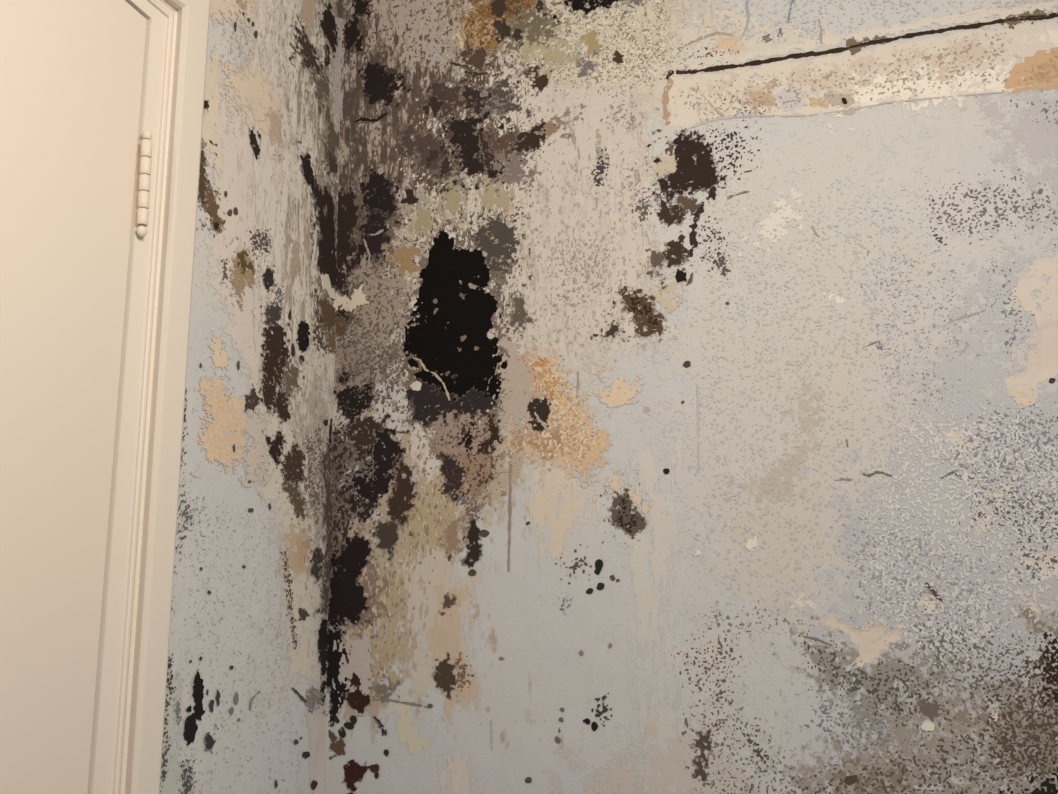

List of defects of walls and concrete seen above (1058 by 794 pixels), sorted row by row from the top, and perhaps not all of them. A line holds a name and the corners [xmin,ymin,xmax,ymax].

crack [666,0,1058,129]
peeling [190,328,278,499]
leakage [175,388,246,646]
leakage [160,636,286,794]
leakage [342,759,385,794]
leakage [552,708,587,775]
leakage [583,691,623,742]